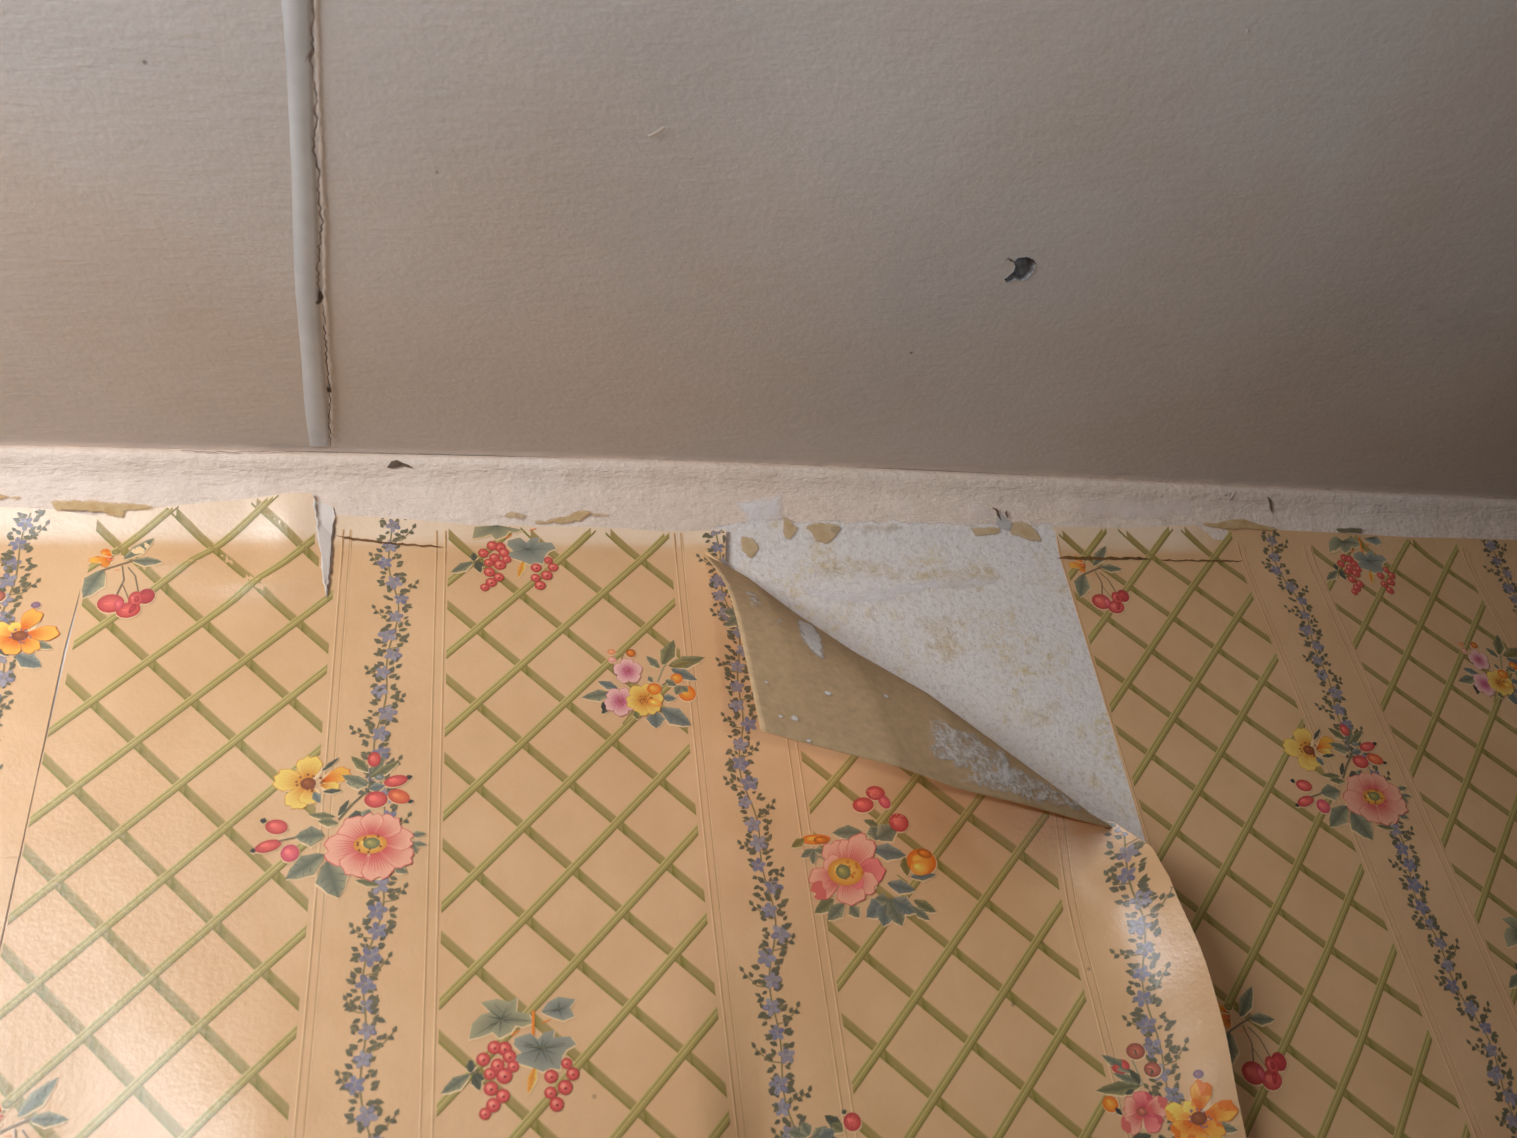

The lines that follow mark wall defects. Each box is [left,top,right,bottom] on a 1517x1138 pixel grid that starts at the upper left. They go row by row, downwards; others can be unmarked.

crack [181,0,335,453]
flaking render [1004,256,1036,282]
flaking render [704,496,1146,843]